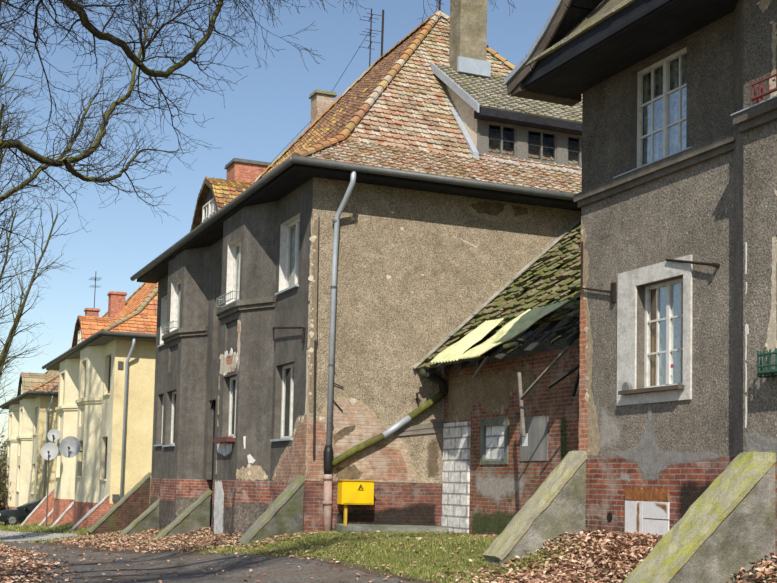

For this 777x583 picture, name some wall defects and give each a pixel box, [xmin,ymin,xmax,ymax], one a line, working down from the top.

flaking render [769,21,777,98]
flaking render [764,237,777,352]
flaking render [217,320,241,427]
flaking render [236,218,422,483]
peeling [213,442,232,534]
leakage [337,504,435,526]